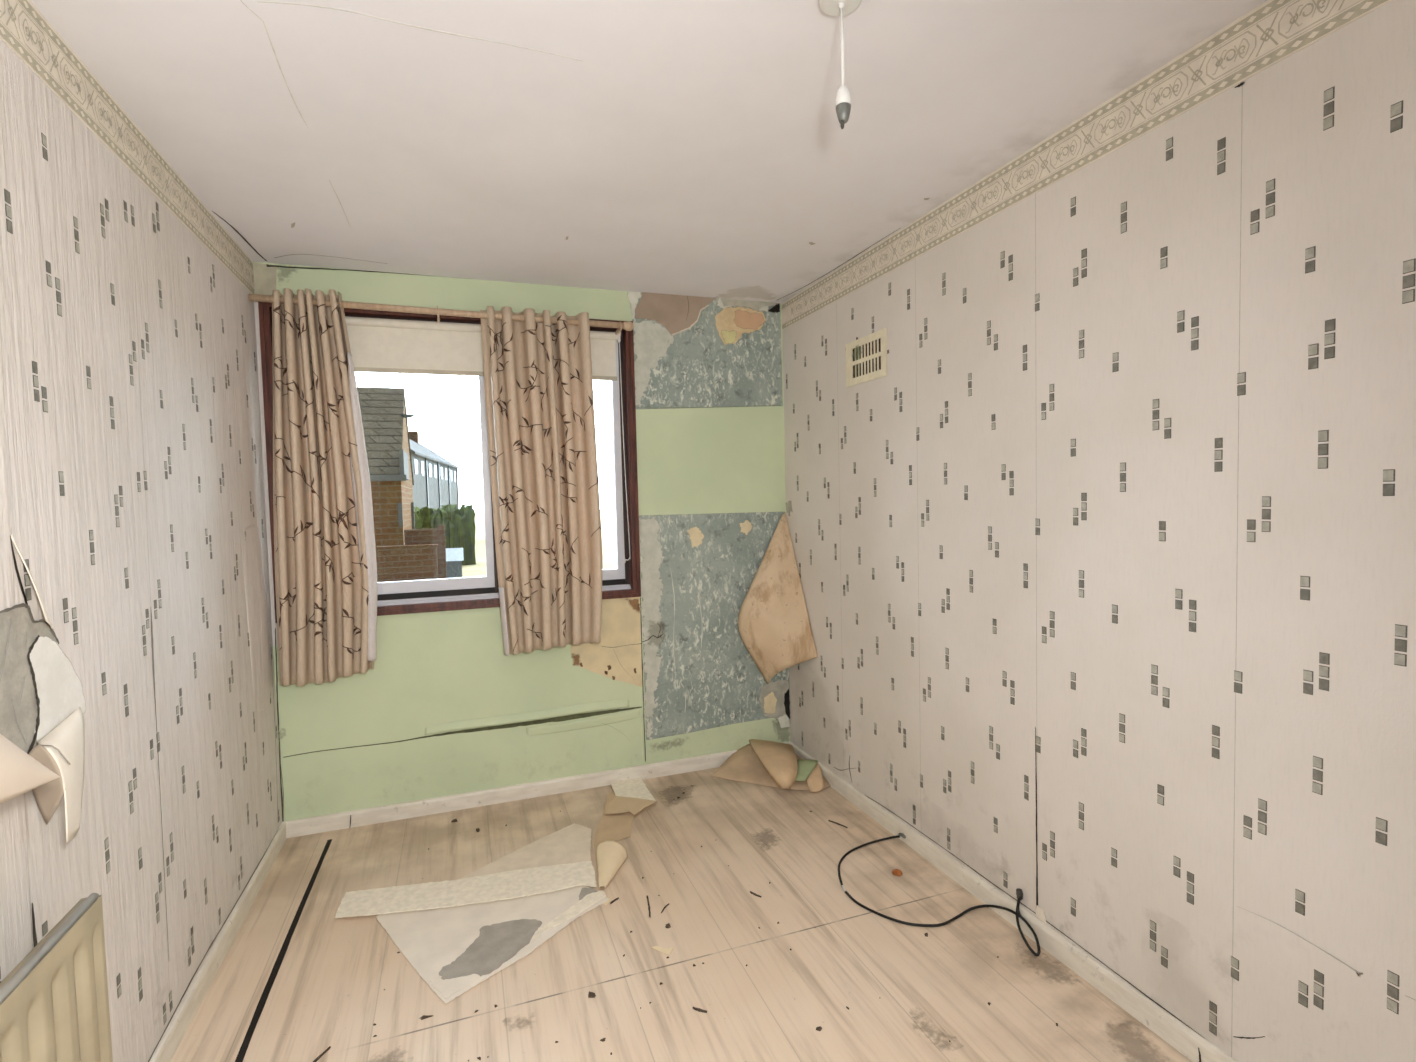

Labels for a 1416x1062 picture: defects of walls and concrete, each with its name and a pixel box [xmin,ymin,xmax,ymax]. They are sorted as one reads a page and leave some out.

crack [240,0,582,127]
crack [212,180,466,279]
peeling [628,291,780,345]
spalling [687,527,704,548]
spalling [739,520,753,535]
peeling [0,603,86,804]
spalling [759,680,790,728]
crack [148,597,663,1062]